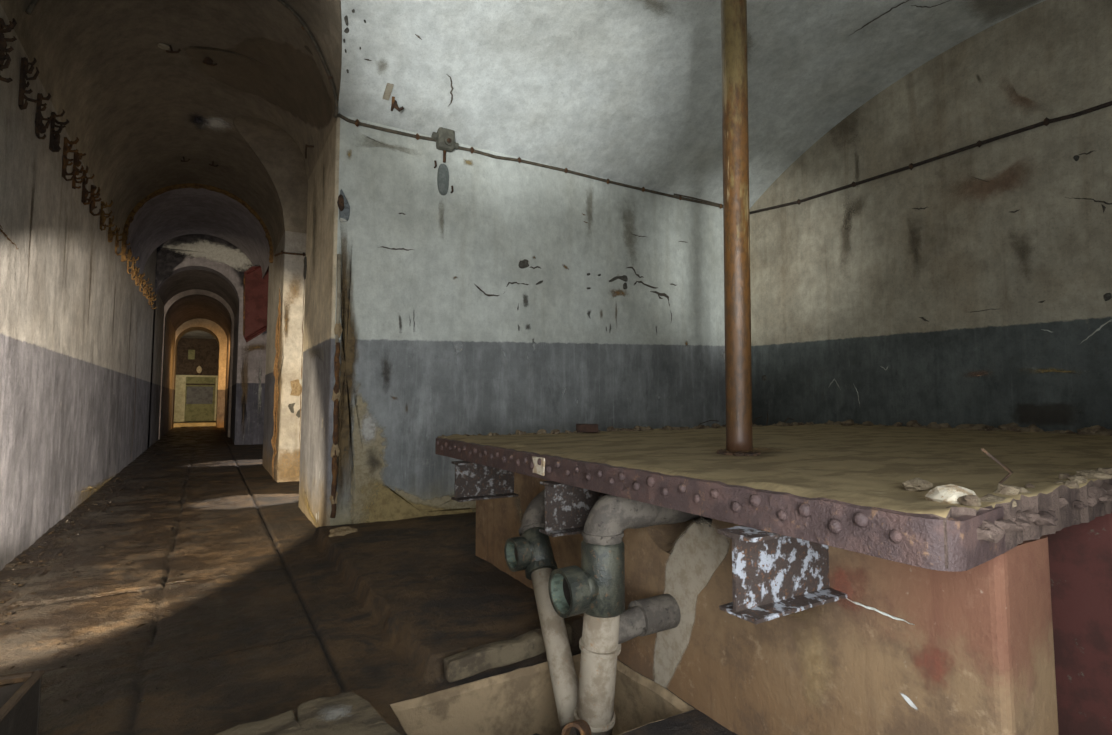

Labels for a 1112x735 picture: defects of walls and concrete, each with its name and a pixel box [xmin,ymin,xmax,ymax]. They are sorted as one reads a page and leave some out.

crack [851,0,951,35]
spalling [339,189,350,224]
crack [1065,197,1112,213]
spalling [587,273,628,289]
spalling [288,379,302,418]
peeling [350,392,476,524]